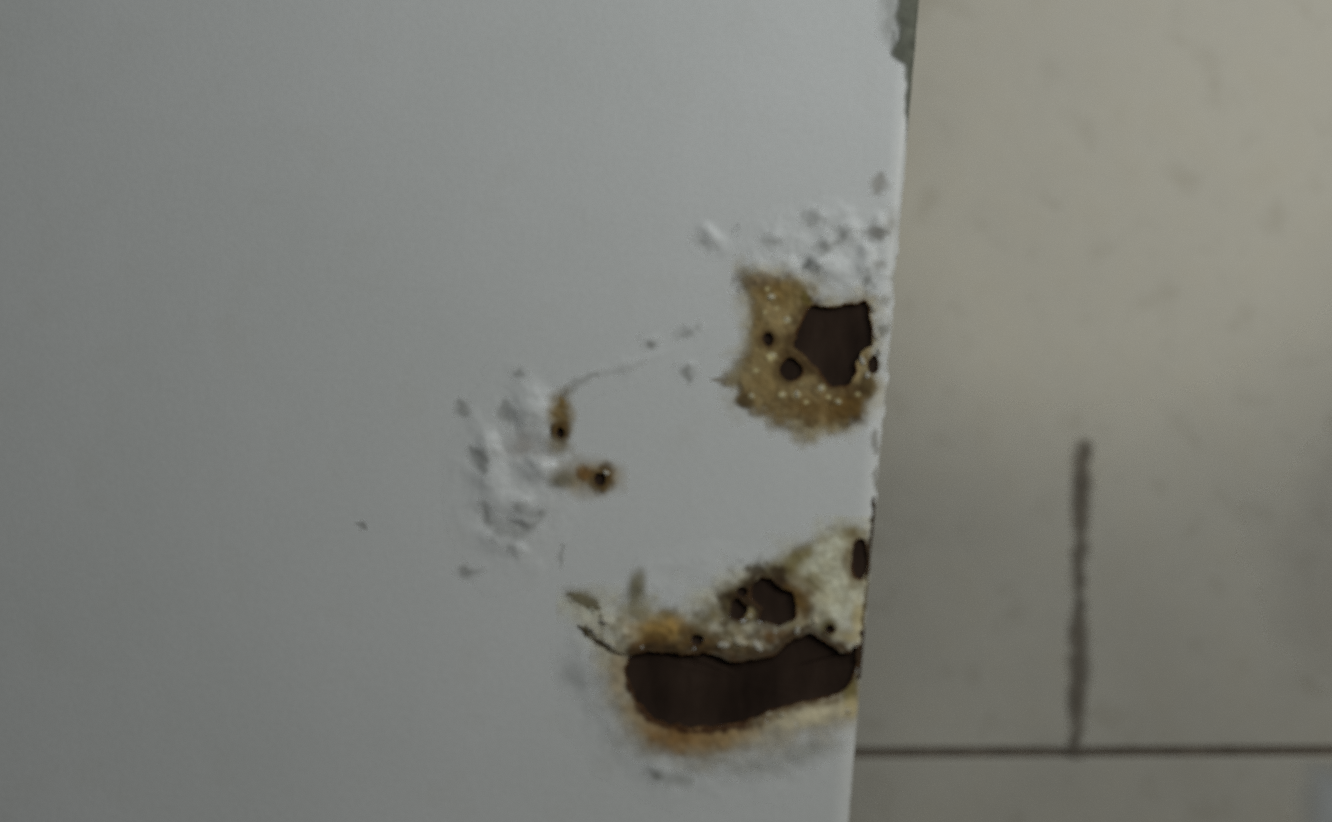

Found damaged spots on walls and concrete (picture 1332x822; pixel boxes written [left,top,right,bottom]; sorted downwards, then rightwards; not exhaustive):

spalling [763,333,774,346]
corrosion [716,271,879,430]
spalling [780,301,881,387]
corrosion [550,396,571,450]
corrosion [553,463,615,493]
hole [852,539,868,579]
corrosion [574,496,876,759]
hole [729,578,796,627]
hole [626,625,857,728]